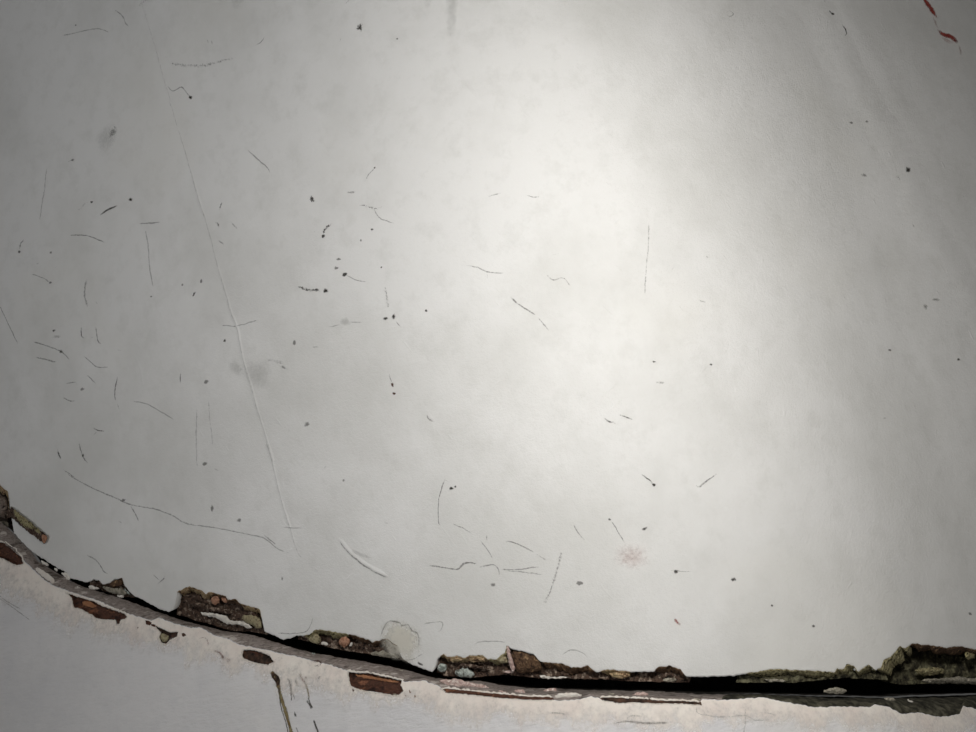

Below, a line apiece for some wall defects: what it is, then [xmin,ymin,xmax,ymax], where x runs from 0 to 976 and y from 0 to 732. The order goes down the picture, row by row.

spalling [0,486,47,544]
peeling [0,541,976,732]